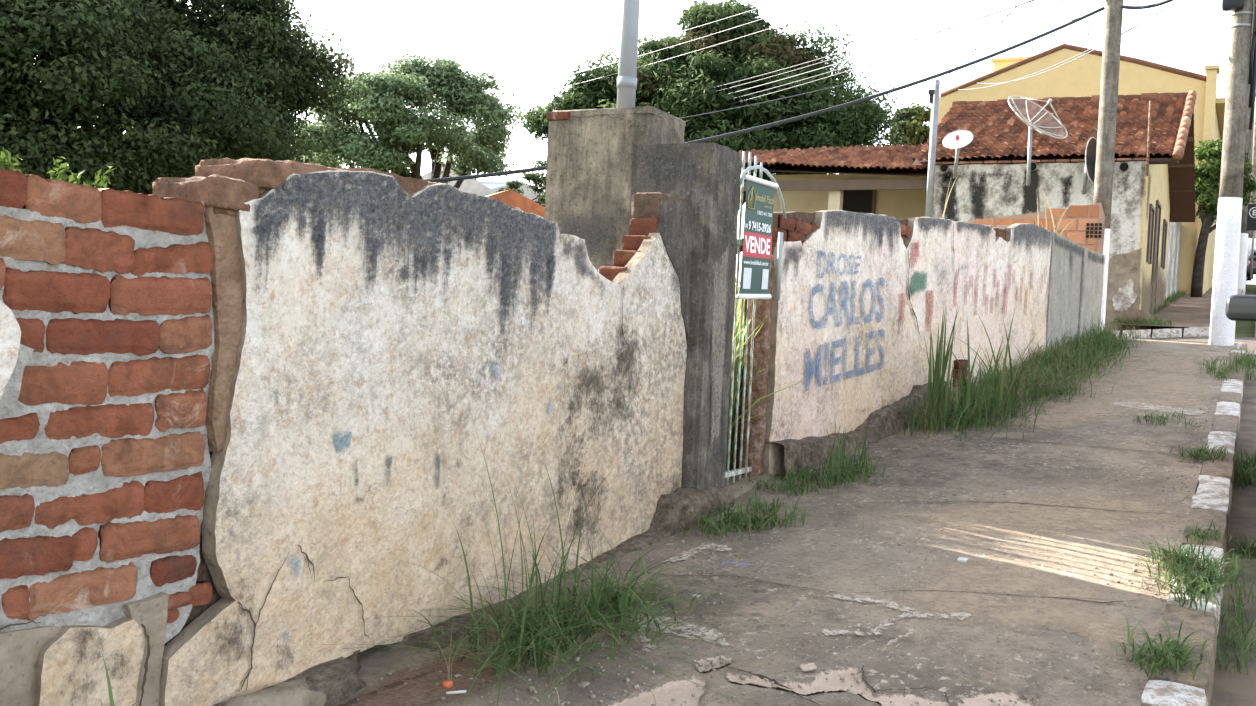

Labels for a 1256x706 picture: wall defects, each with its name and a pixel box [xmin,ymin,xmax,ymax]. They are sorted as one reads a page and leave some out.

leakage [253,172,615,342]
flaking render [598,192,691,282]
leakage [826,210,901,255]
leakage [916,169,1105,278]
flaking render [0,169,243,706]
leakage [557,326,642,540]
crack [238,545,369,692]